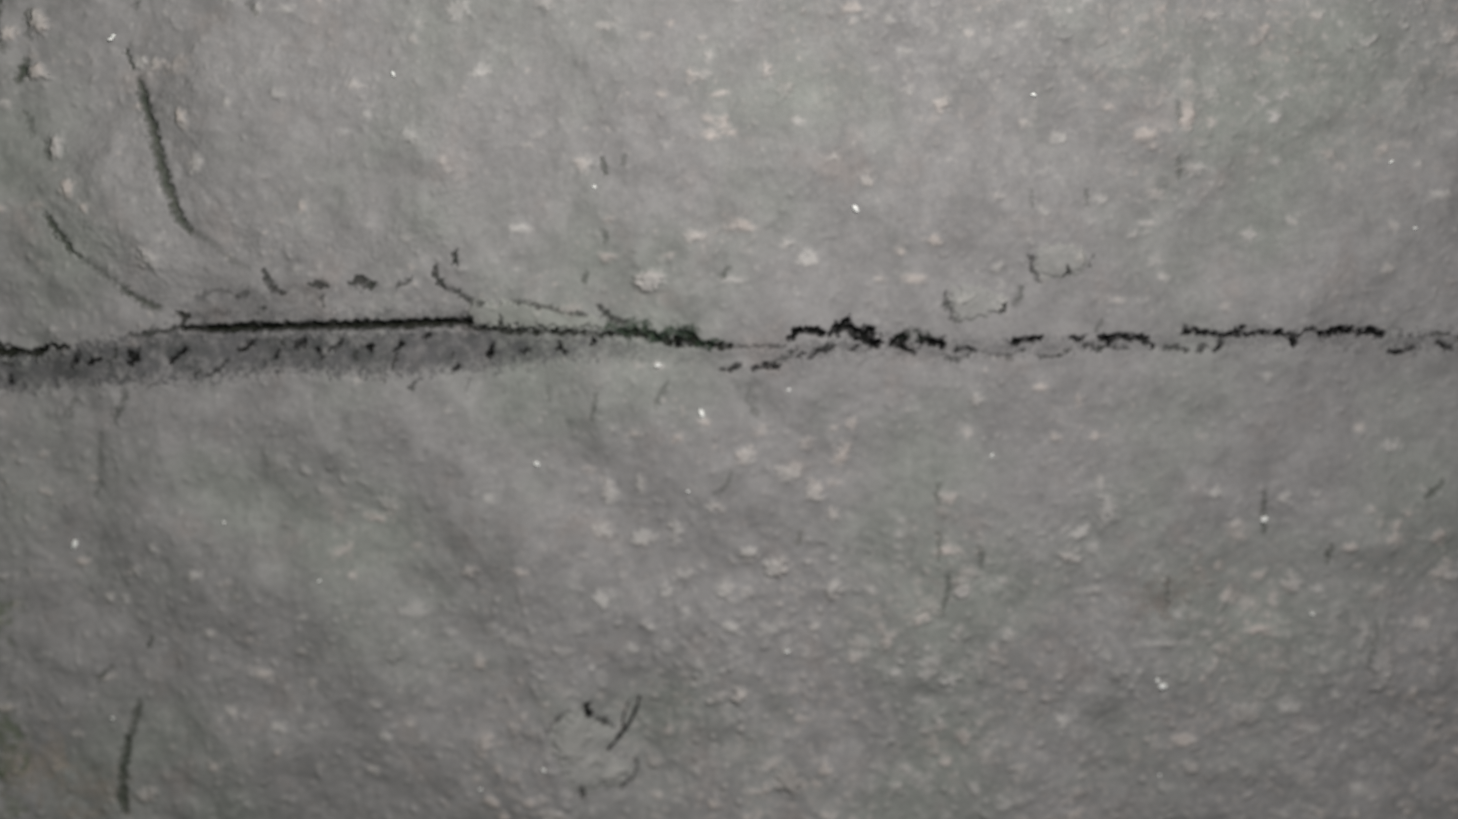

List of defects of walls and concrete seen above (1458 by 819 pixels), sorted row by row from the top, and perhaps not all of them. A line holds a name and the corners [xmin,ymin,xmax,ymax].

crack [126,50,191,232]
crack [46,217,77,255]
crack [0,343,69,362]
crack [128,292,974,372]
crack [1010,325,1450,357]